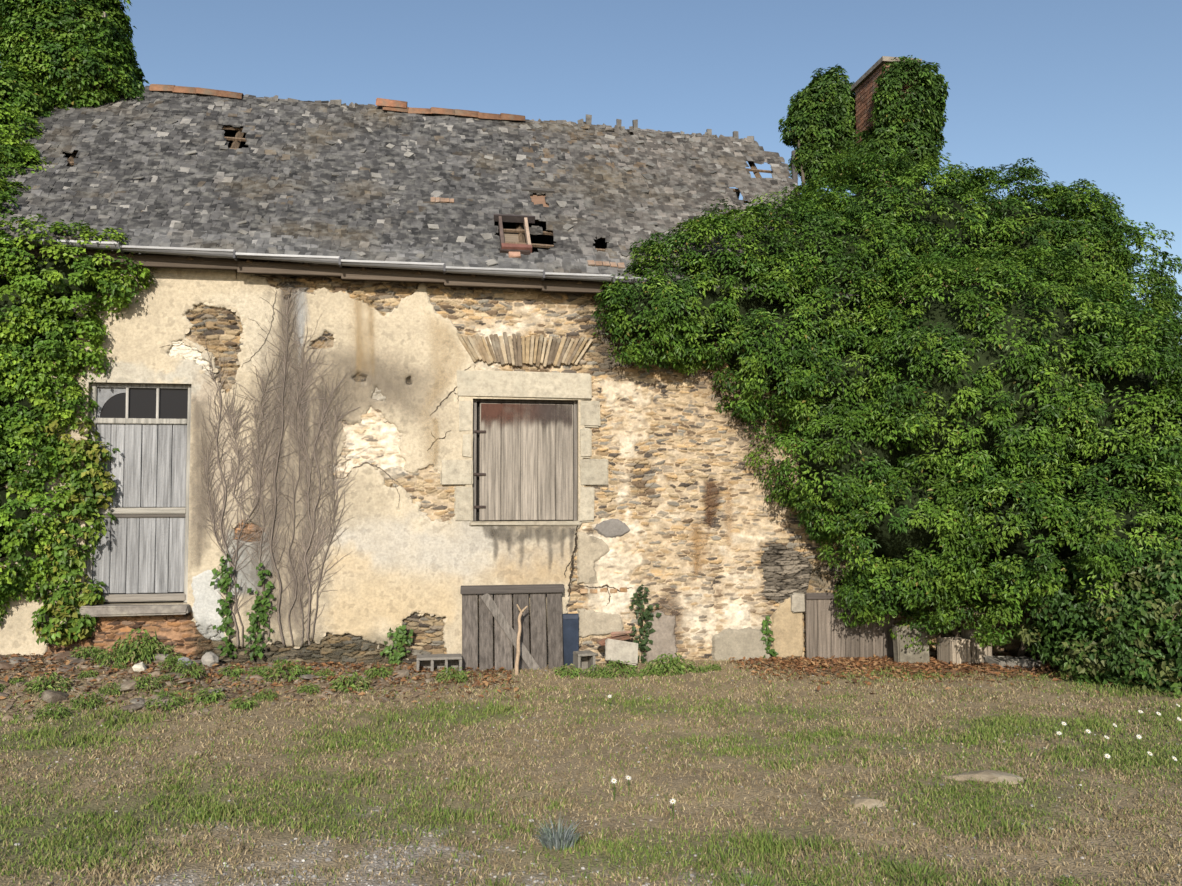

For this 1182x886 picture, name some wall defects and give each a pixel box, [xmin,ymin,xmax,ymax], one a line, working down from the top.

peeling [168,303,247,393]
peeling [330,373,465,524]
spalling [596,631,634,646]